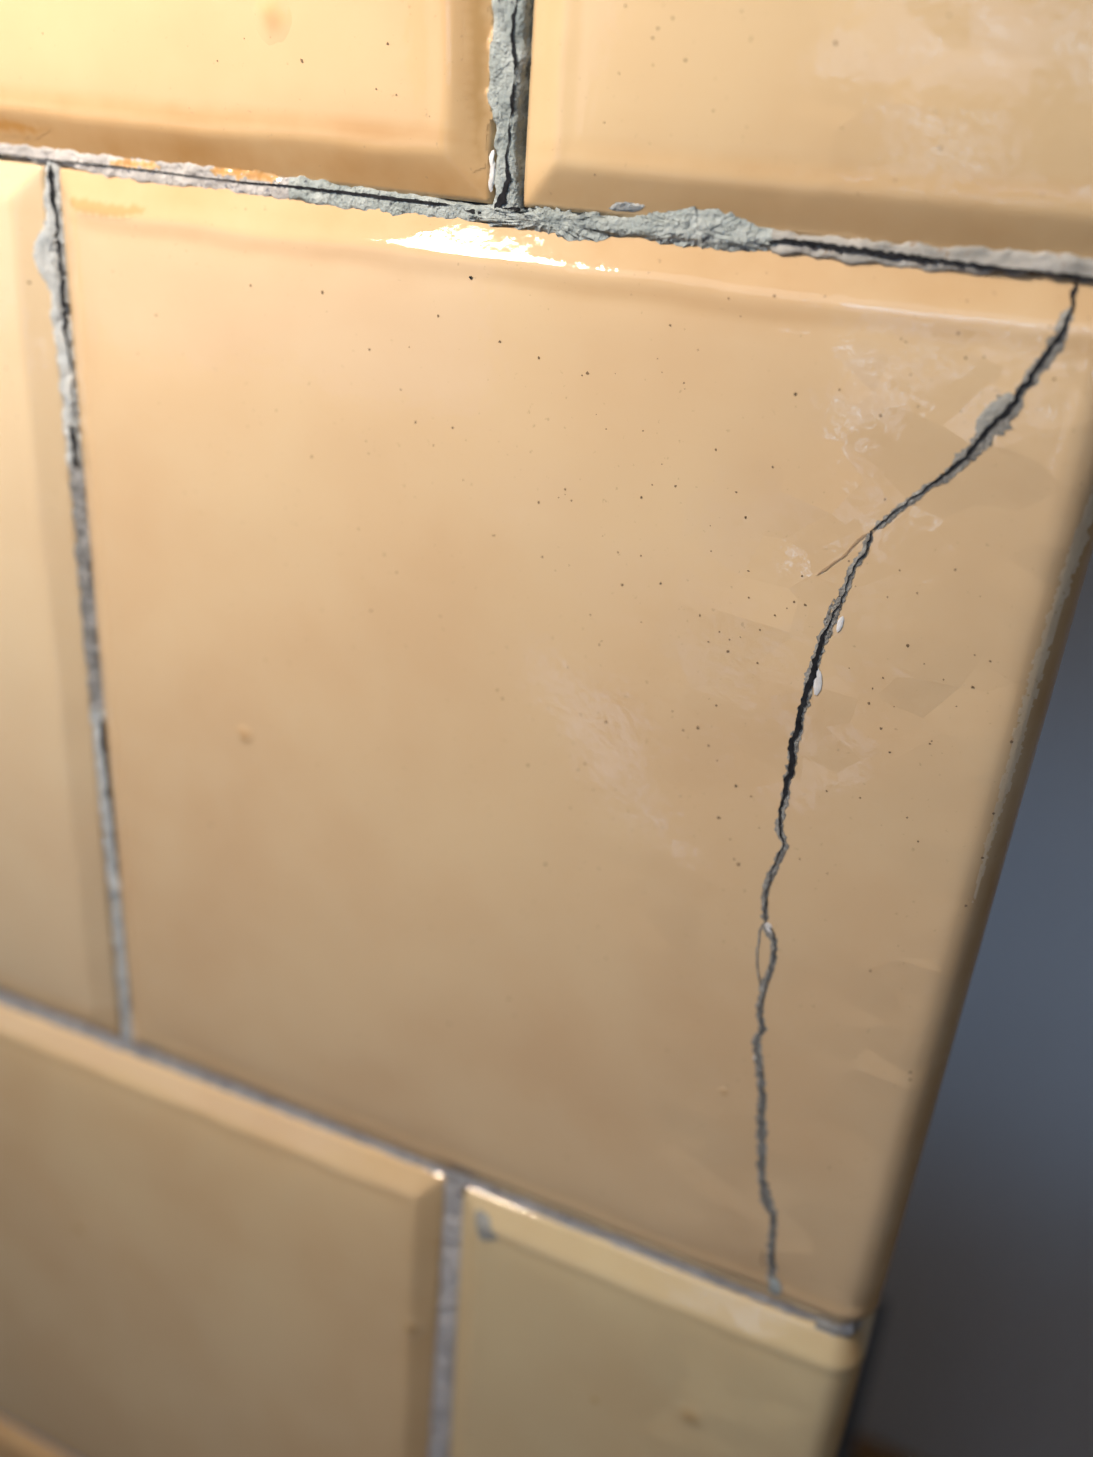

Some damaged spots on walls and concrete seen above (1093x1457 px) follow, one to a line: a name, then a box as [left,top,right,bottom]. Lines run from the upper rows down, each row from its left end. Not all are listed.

crack [751,238,1093,1297]